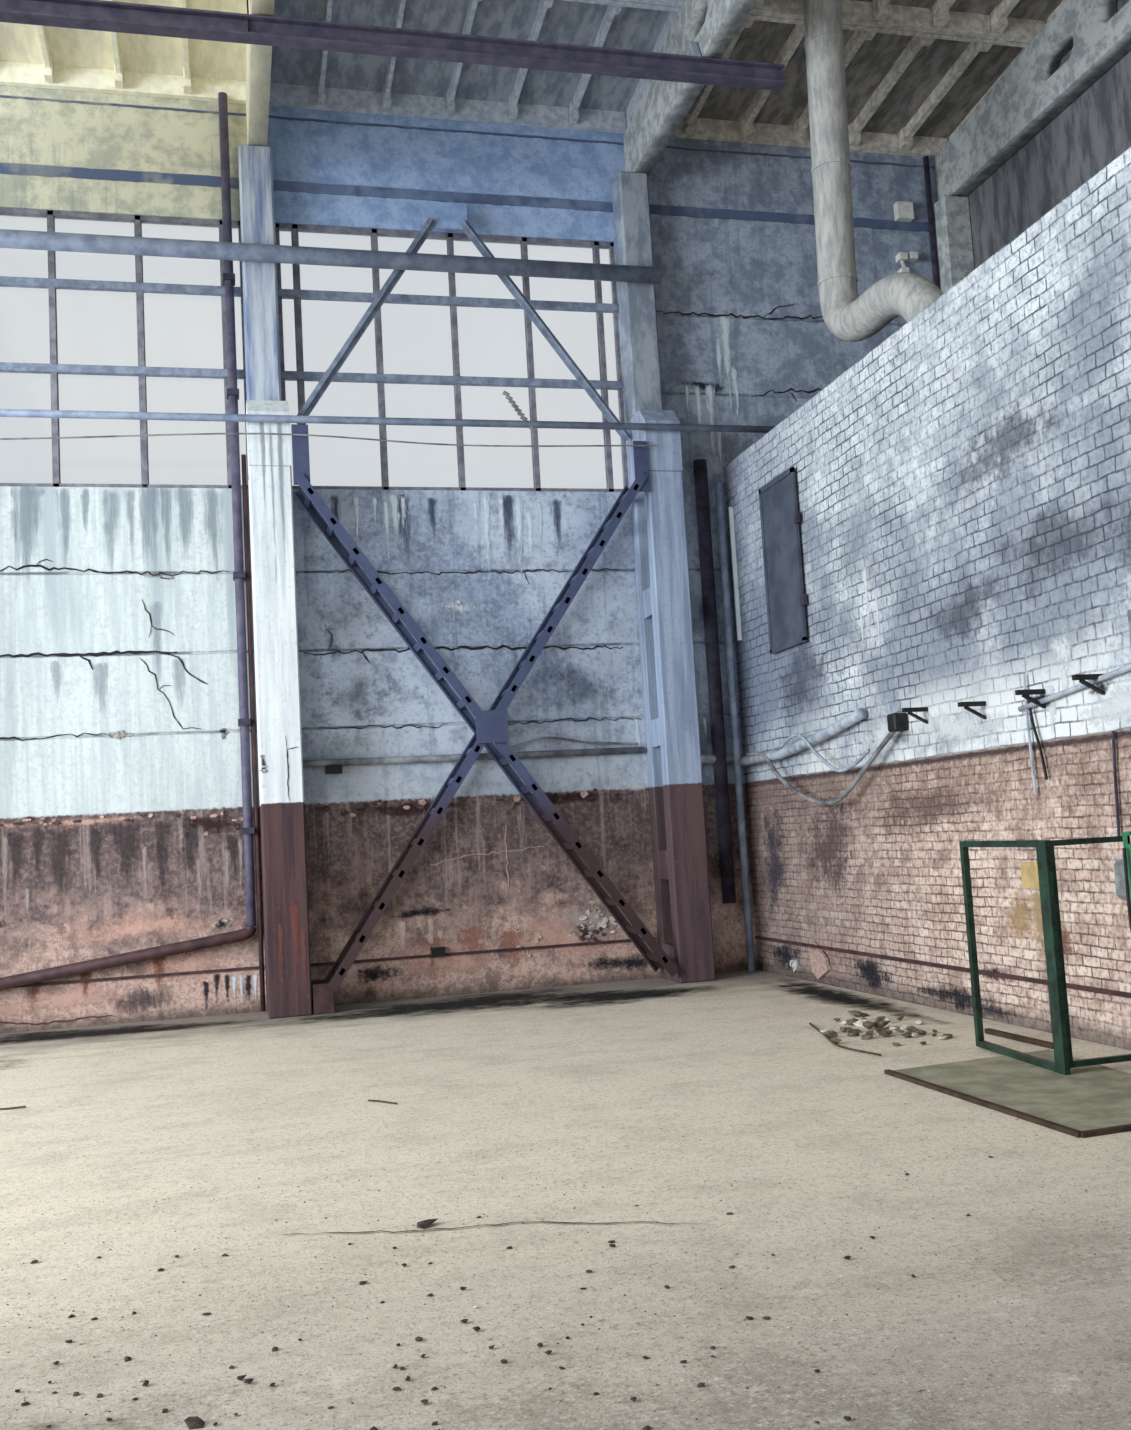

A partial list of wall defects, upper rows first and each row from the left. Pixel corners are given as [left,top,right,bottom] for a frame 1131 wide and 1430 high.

crack [656,304,823,320]
water stain [14,486,38,562]
water stain [60,487,191,548]
water stain [207,491,216,547]
water stain [332,494,408,561]
water stain [473,495,560,571]
crack [0,559,229,729]
crack [0,733,107,741]
water stain [2,829,69,924]
water stain [808,806,846,888]